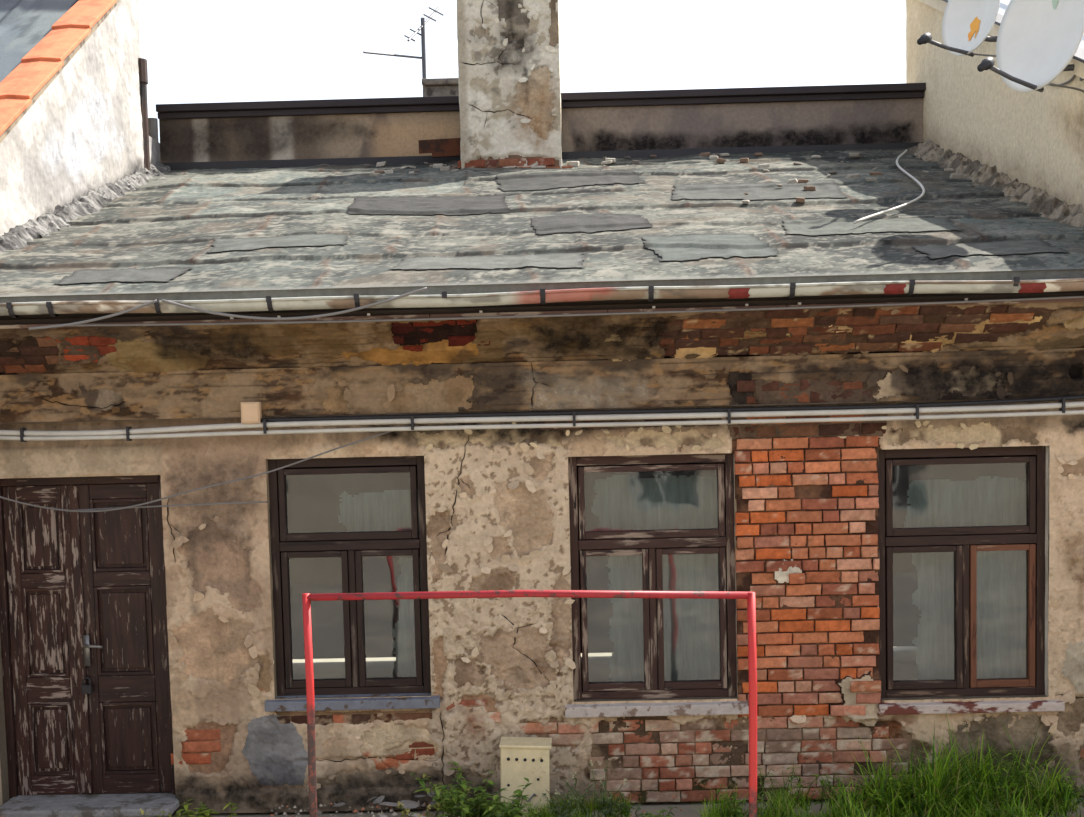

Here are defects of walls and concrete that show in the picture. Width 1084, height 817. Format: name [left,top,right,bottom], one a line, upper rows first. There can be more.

flaking render [473,0,559,53]
crack [469,104,530,127]
flaking render [513,63,557,140]
flaking render [458,155,573,169]
flaking render [0,331,117,374]
flaking render [391,319,491,352]
flaking render [413,301,1084,803]
flaking render [170,516,273,697]
flaking render [276,566,576,793]
flaking render [171,719,238,774]